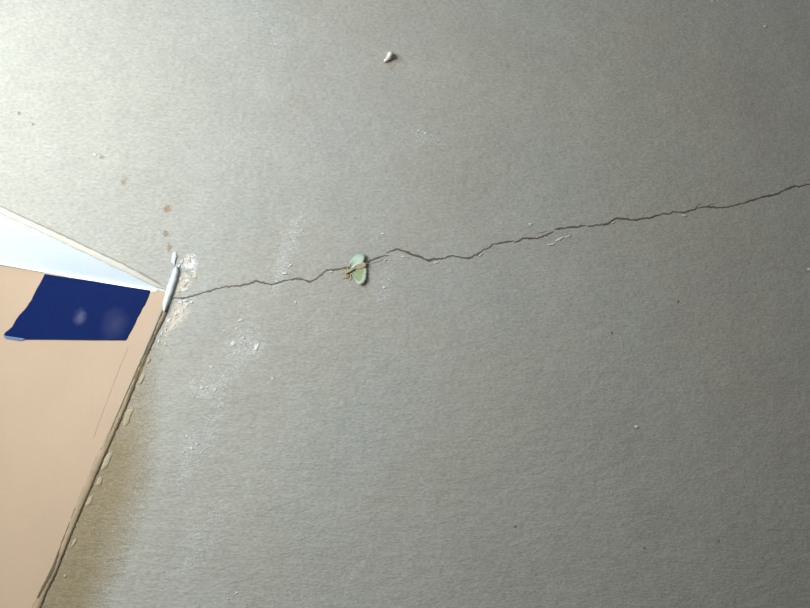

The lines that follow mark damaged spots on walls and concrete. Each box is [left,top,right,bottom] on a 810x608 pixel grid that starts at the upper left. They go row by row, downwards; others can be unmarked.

crack [32,183,810,608]